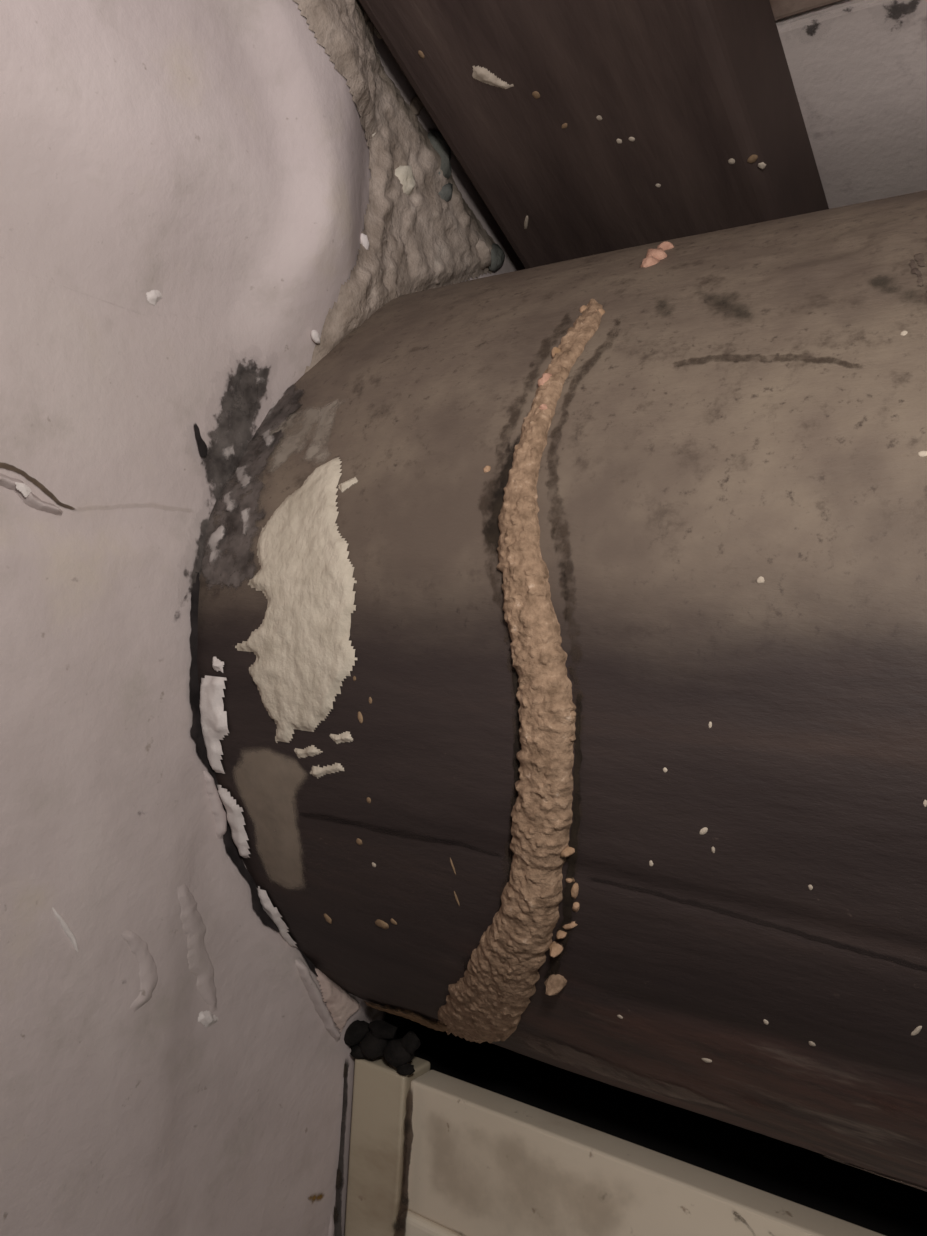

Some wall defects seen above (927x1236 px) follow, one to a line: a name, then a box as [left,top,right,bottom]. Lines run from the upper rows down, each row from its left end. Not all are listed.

leakage [184,359,303,599]
flaking render [338,477,358,492]
flaking render [330,731,353,744]
flaking render [294,745,344,779]
crack [301,813,497,856]
crack [592,878,927,971]